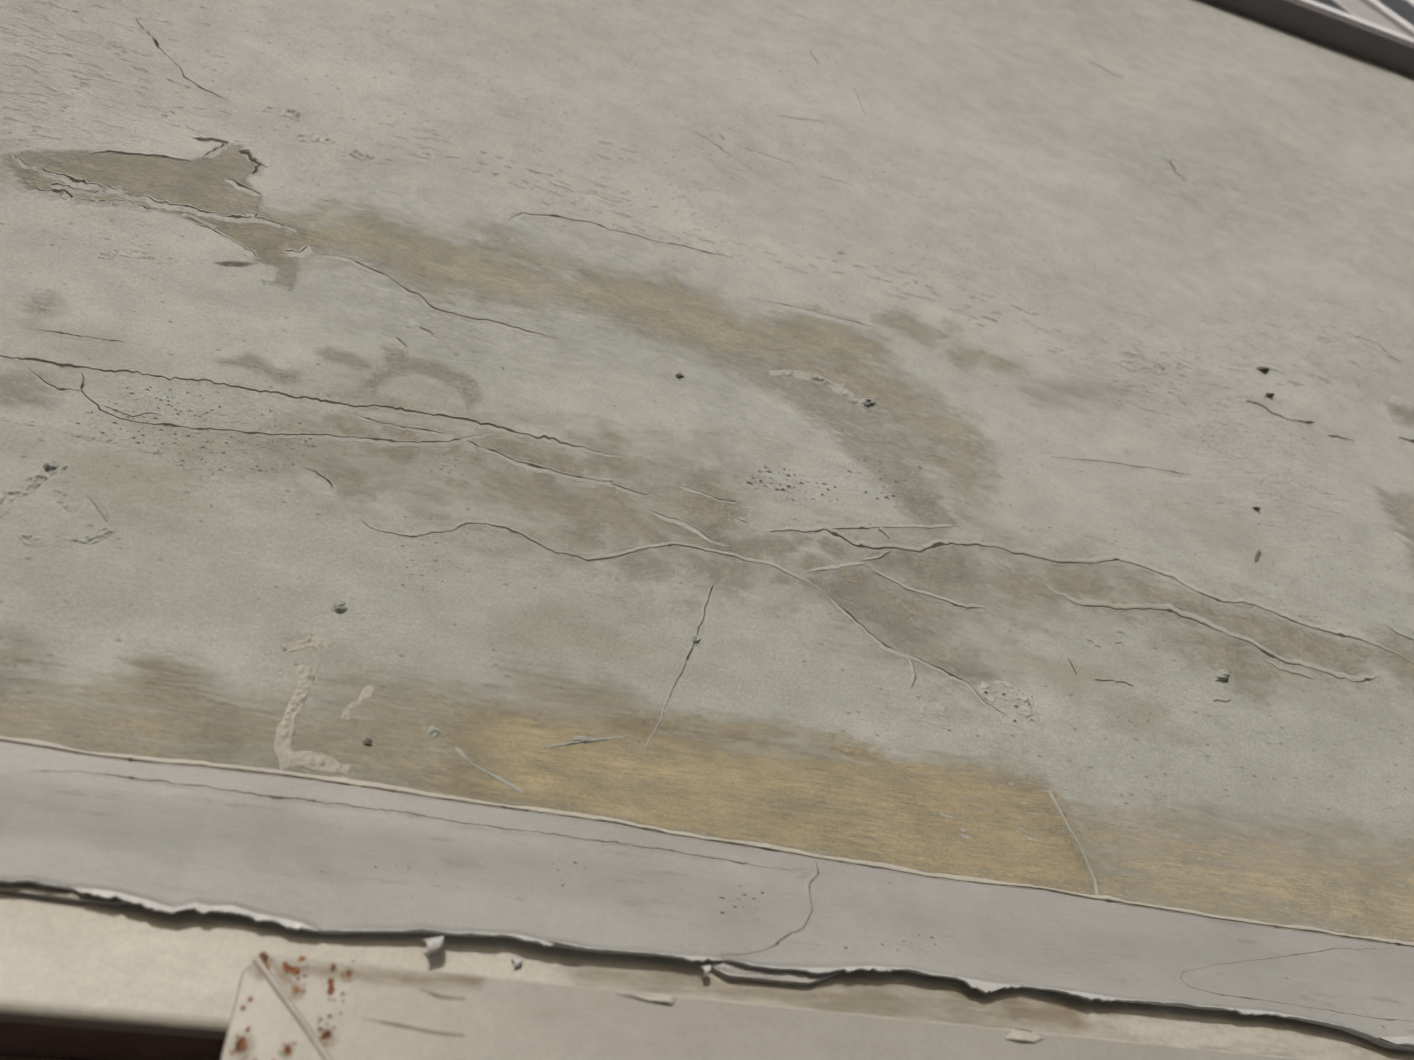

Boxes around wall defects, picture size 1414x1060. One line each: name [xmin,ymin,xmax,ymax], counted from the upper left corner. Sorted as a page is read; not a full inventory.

peeling [4,5,333,290]
damp [257,206,984,525]
crack [748,297,879,331]
crack [0,329,1414,750]
damp [0,664,1414,942]
rust [231,1026,296,1060]
rust [258,951,310,998]
rust [313,960,355,1045]
peeling [0,874,1414,1052]